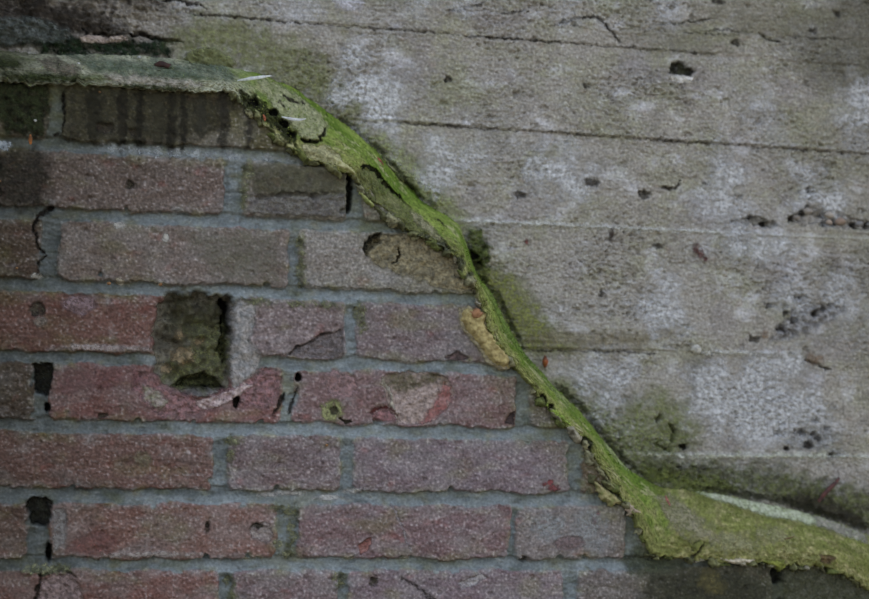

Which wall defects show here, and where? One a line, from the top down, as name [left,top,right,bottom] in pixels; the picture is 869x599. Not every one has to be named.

damp [0,0,130,38]
spalling [105,74,202,88]
damp [63,86,253,160]
damp [328,45,401,134]
crack [32,206,54,273]
spalling [245,80,510,369]
damp [696,157,802,262]
spalling [133,368,282,419]
spalling [372,371,454,424]
damp [693,350,825,444]
peeling [534,394,641,517]
damp [787,491,868,528]